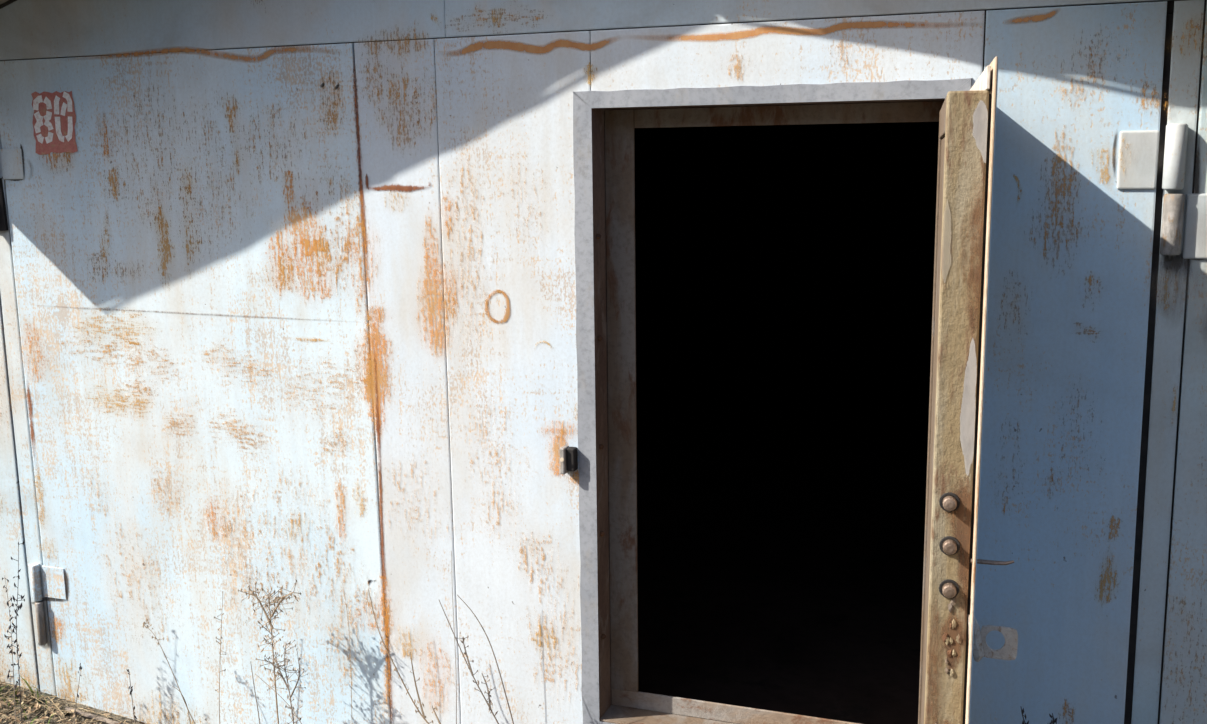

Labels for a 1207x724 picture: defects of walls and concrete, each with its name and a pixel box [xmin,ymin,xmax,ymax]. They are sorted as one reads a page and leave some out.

corrosion [670,21,925,65]
corrosion [1012,11,1056,23]
corrosion [1030,126,1128,271]
corrosion [963,192,984,330]
corrosion [61,308,177,417]
corrosion [98,7,610,719]
corrosion [948,477,972,611]
corrosion [1094,556,1117,603]
corrosion [134,691,203,724]
corrosion [927,605,943,723]